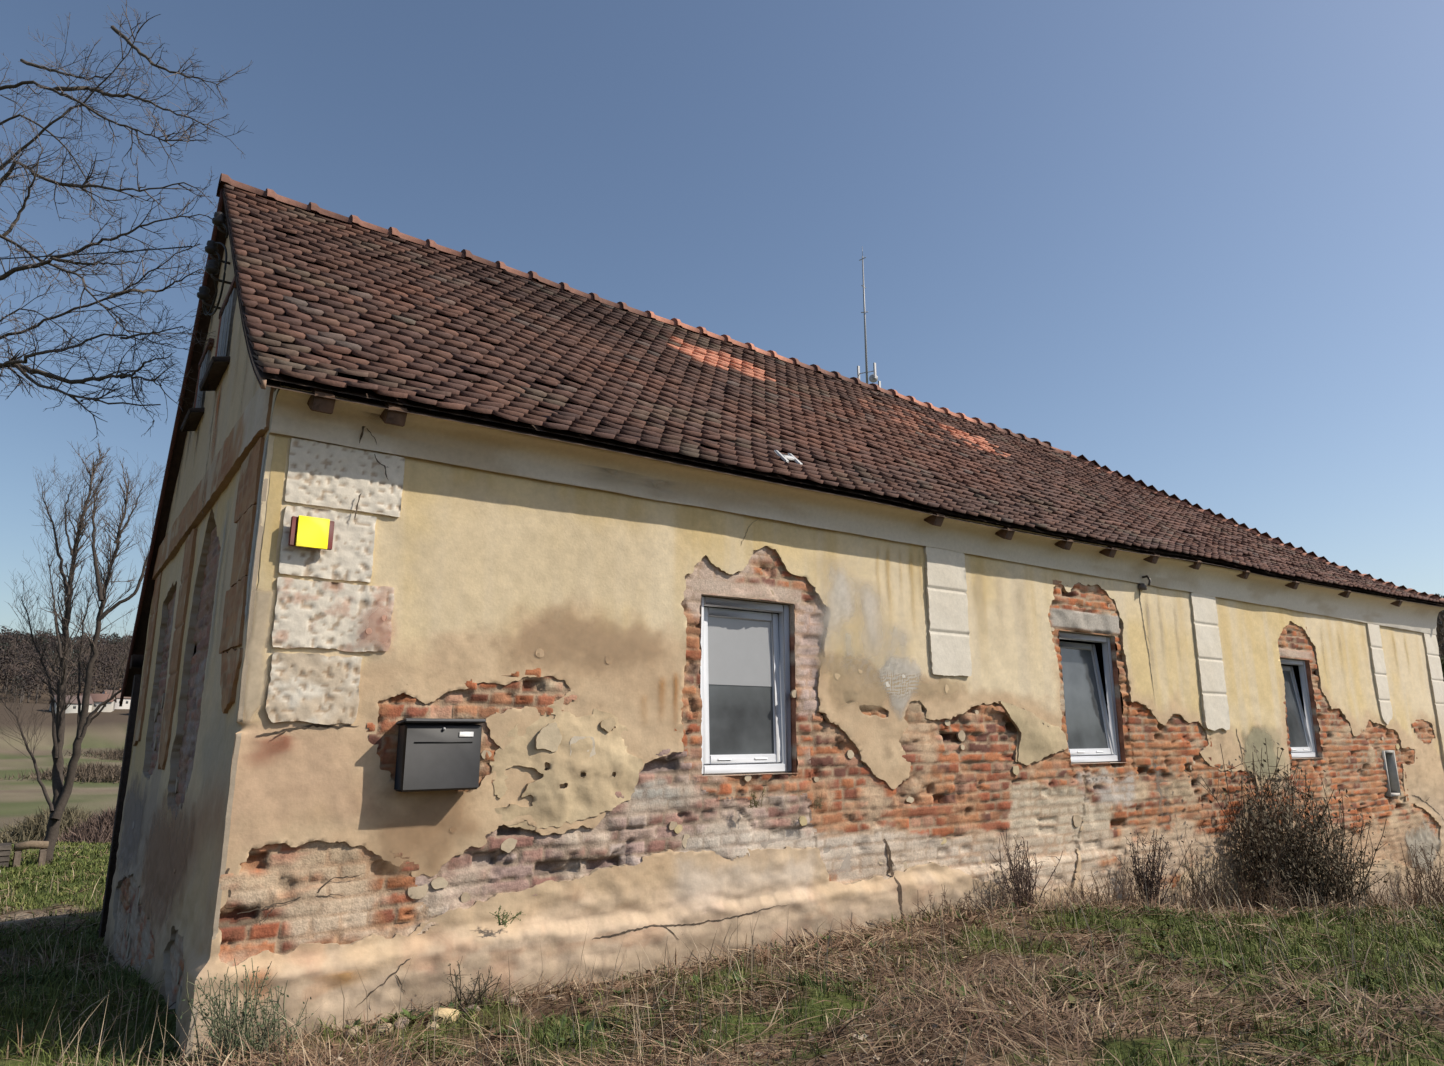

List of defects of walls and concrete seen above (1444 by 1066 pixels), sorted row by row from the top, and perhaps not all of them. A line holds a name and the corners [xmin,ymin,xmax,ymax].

spalling [175,525,221,814]
spalling [218,546,1440,966]